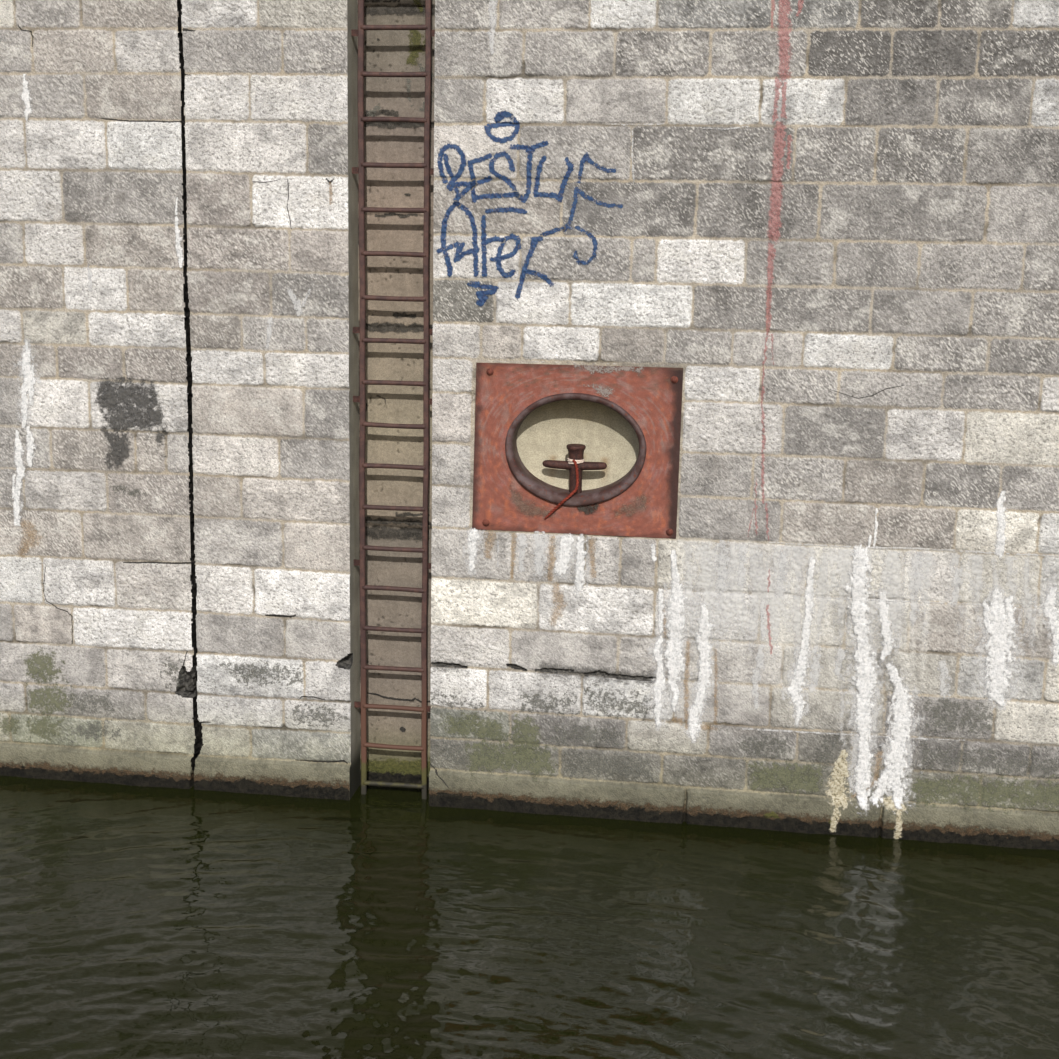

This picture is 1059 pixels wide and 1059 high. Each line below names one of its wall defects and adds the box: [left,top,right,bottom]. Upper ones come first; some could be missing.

leakage [12,339,41,526]
crack [101,0,211,775]
spalling [175,665,198,698]
leakage [429,78,1059,850]